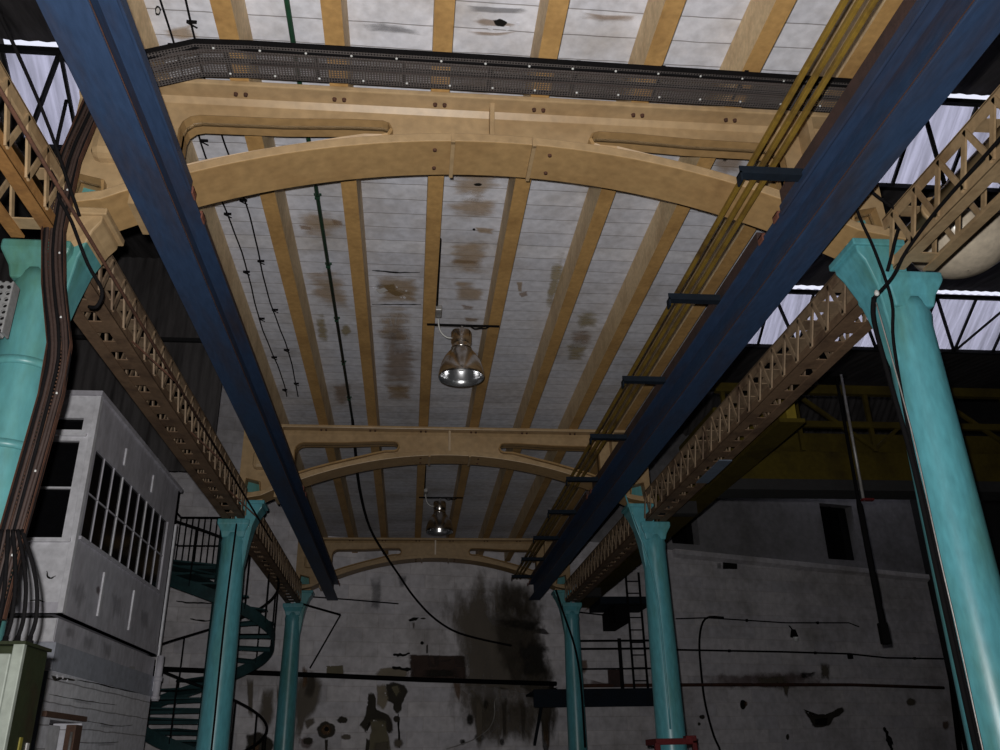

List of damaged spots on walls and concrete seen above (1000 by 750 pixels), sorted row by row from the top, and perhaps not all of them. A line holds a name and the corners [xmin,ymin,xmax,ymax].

damp [382,281,413,300]
flaking render [360,641,468,750]
damp [453,583,556,745]
flaking render [804,707,844,727]